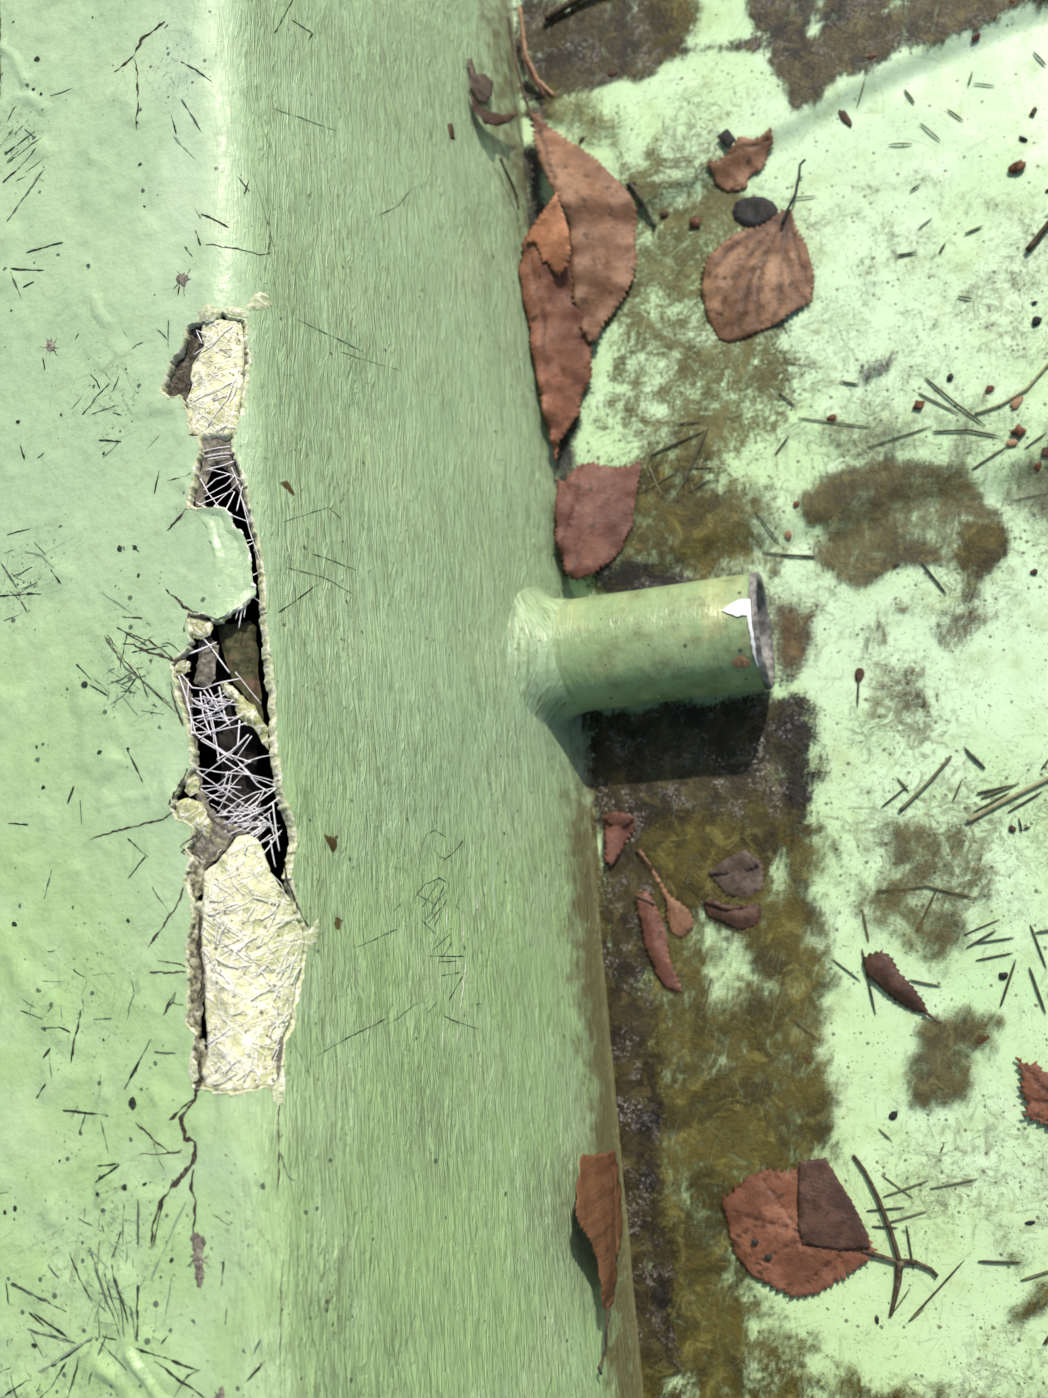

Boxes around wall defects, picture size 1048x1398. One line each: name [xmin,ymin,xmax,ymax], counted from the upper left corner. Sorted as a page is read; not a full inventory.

spalling [159,292,320,1106]
damp [773,675,816,810]
crack [135,1059,201,1248]
damp [635,1032,672,1363]